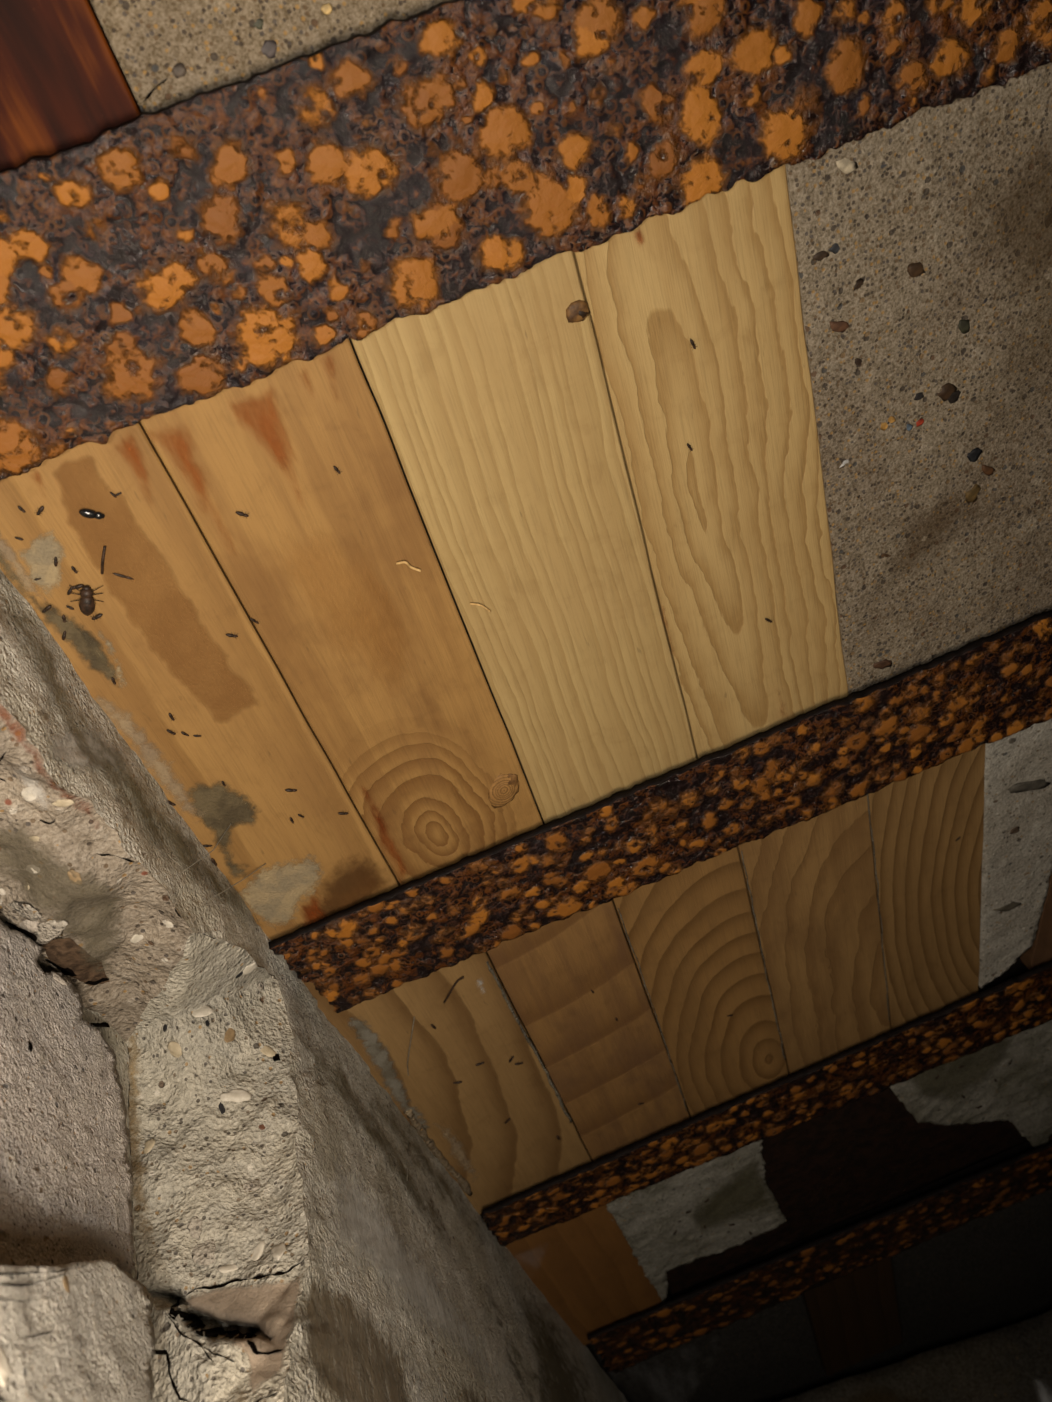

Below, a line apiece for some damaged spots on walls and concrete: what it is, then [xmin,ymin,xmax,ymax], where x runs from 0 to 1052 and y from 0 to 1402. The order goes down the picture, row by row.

damp [0,540,255,905]
crack [154,1259,305,1402]